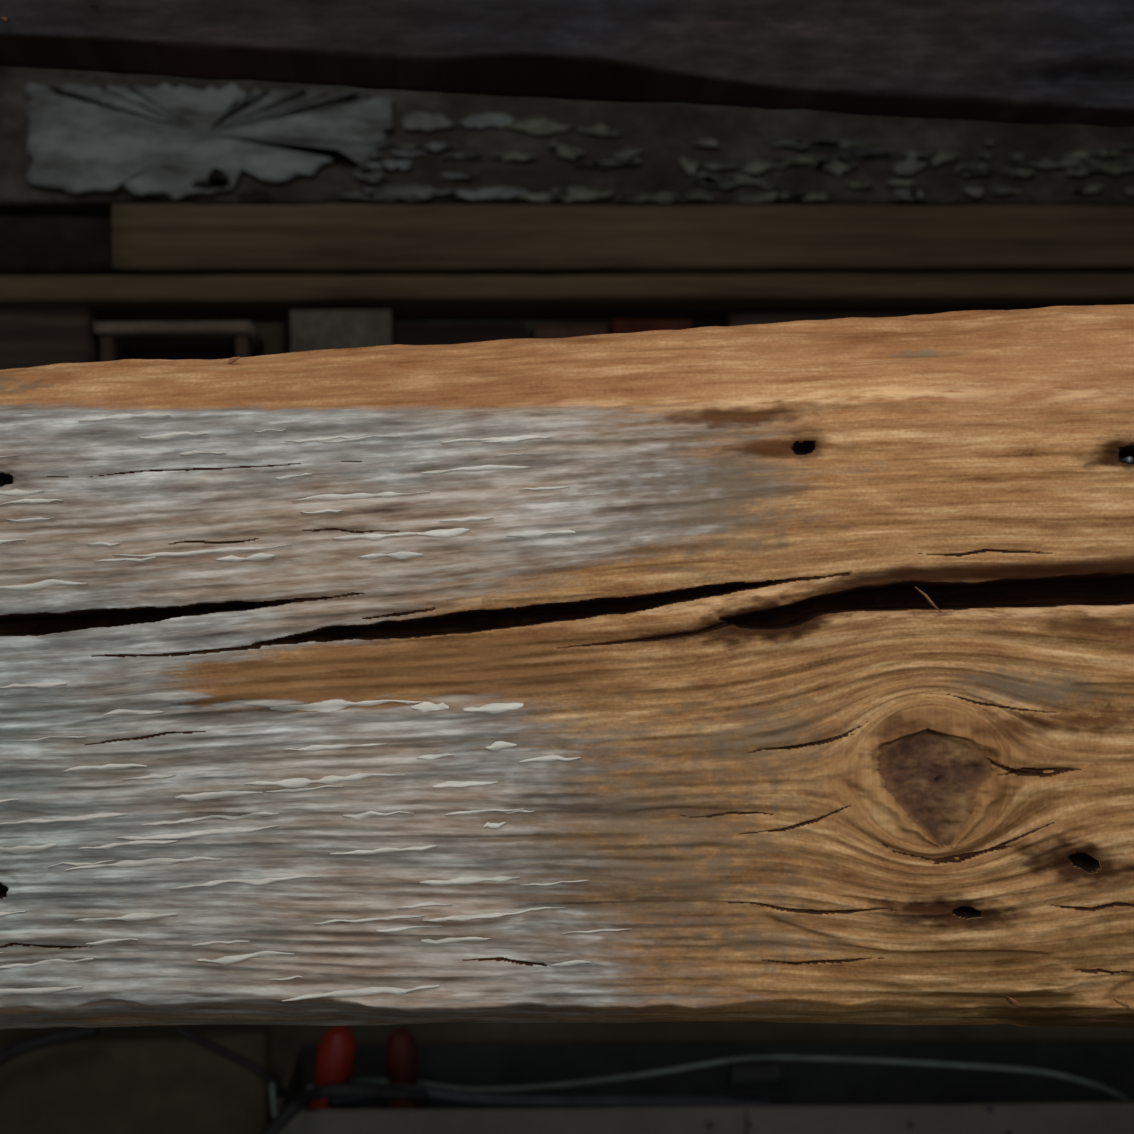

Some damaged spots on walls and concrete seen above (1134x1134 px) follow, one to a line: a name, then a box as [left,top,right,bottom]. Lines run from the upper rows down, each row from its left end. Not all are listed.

peeling [23,83,1134,203]
crack [0,549,1134,658]